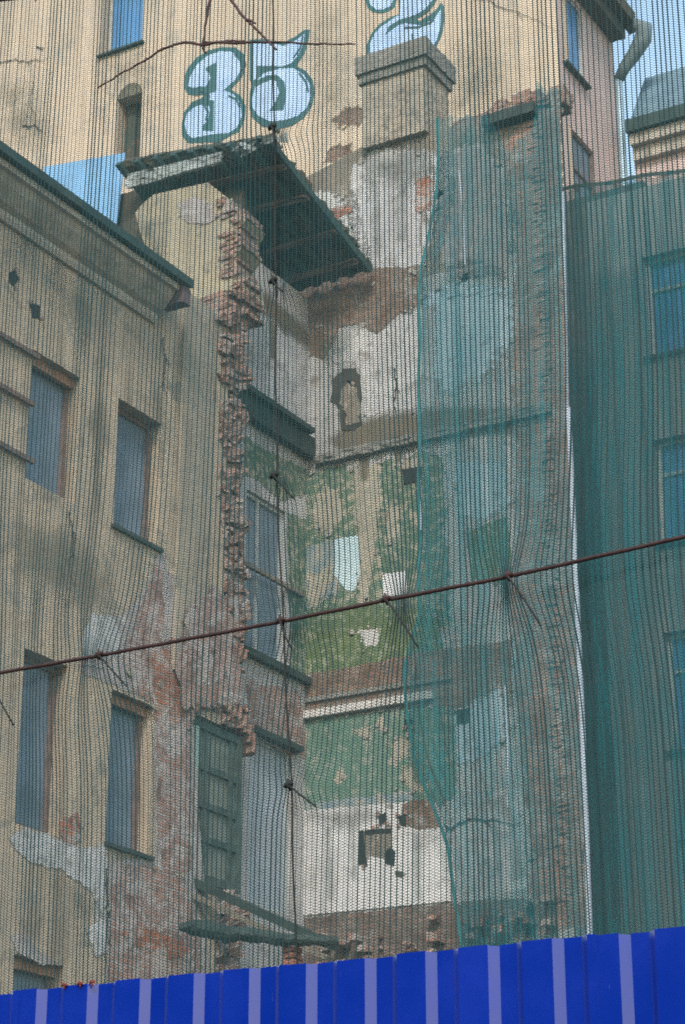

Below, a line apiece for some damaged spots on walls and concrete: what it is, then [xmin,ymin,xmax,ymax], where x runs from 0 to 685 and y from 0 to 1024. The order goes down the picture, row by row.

peeling [316,141,516,417]
peeling [80,290,536,983]